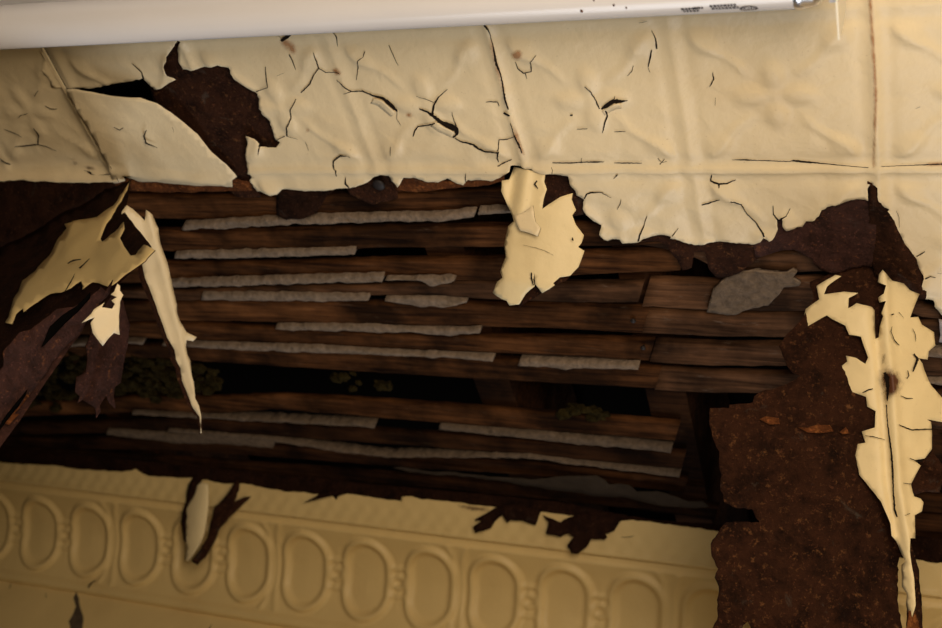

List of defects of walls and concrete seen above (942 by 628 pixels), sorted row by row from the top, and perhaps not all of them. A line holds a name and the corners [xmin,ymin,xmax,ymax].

crack [627,21,658,76]
peeling [370,98,395,117]
crack [256,25,536,166]
peeling [431,122,455,138]
crack [585,87,628,133]
crack [333,155,350,188]
peeling [514,206,541,236]
crack [534,158,667,209]
crack [702,159,942,237]
peeling [82,284,123,346]
rust [882,371,899,395]